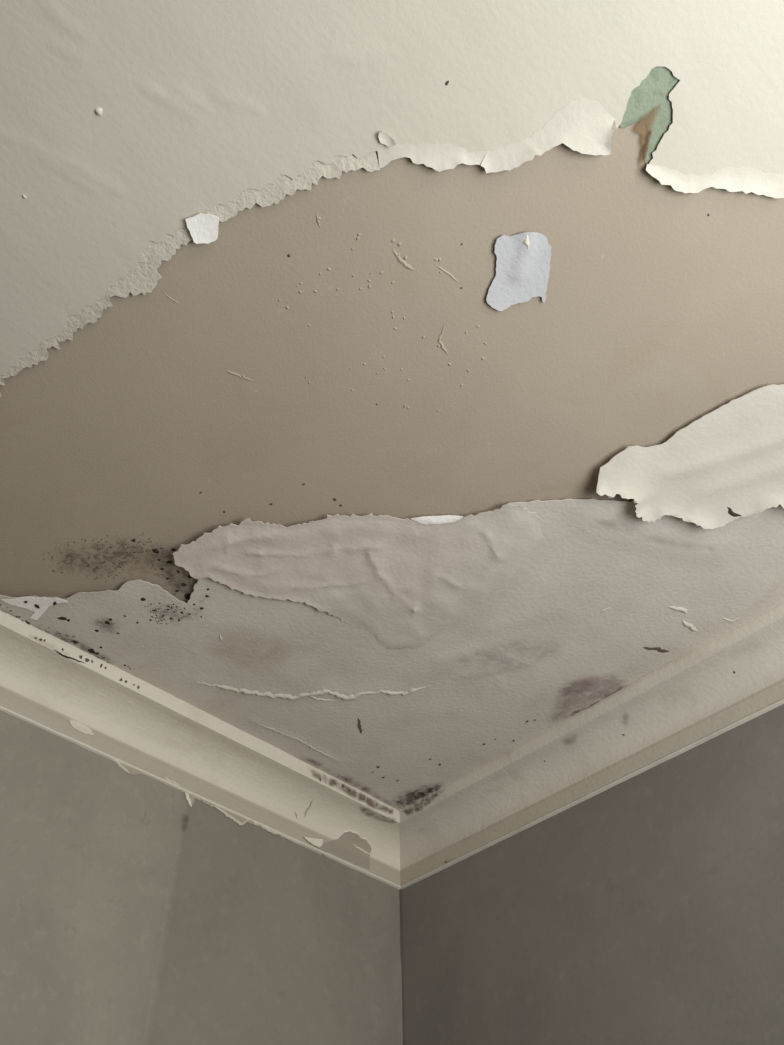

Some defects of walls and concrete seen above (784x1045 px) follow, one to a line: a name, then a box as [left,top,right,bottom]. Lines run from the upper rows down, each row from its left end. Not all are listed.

peeling [0,98,784,620]
crack [727,507,741,517]
damp [67,533,209,634]
damp [0,598,109,669]
damp [314,774,437,815]